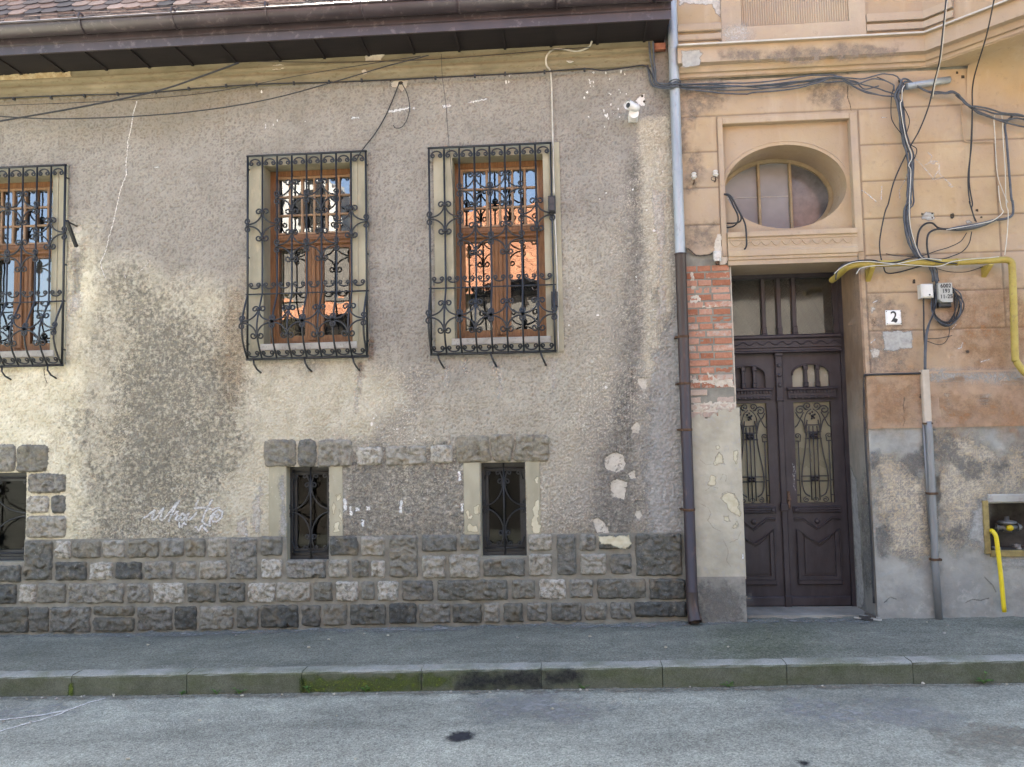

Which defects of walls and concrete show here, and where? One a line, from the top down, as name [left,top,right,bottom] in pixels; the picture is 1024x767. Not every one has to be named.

crack [100,101,149,278]
flaking render [686,234,736,418]
peeling [531,499,541,534]
peeling [592,518,609,533]
peeling [604,452,636,500]
peeling [872,427,1024,565]